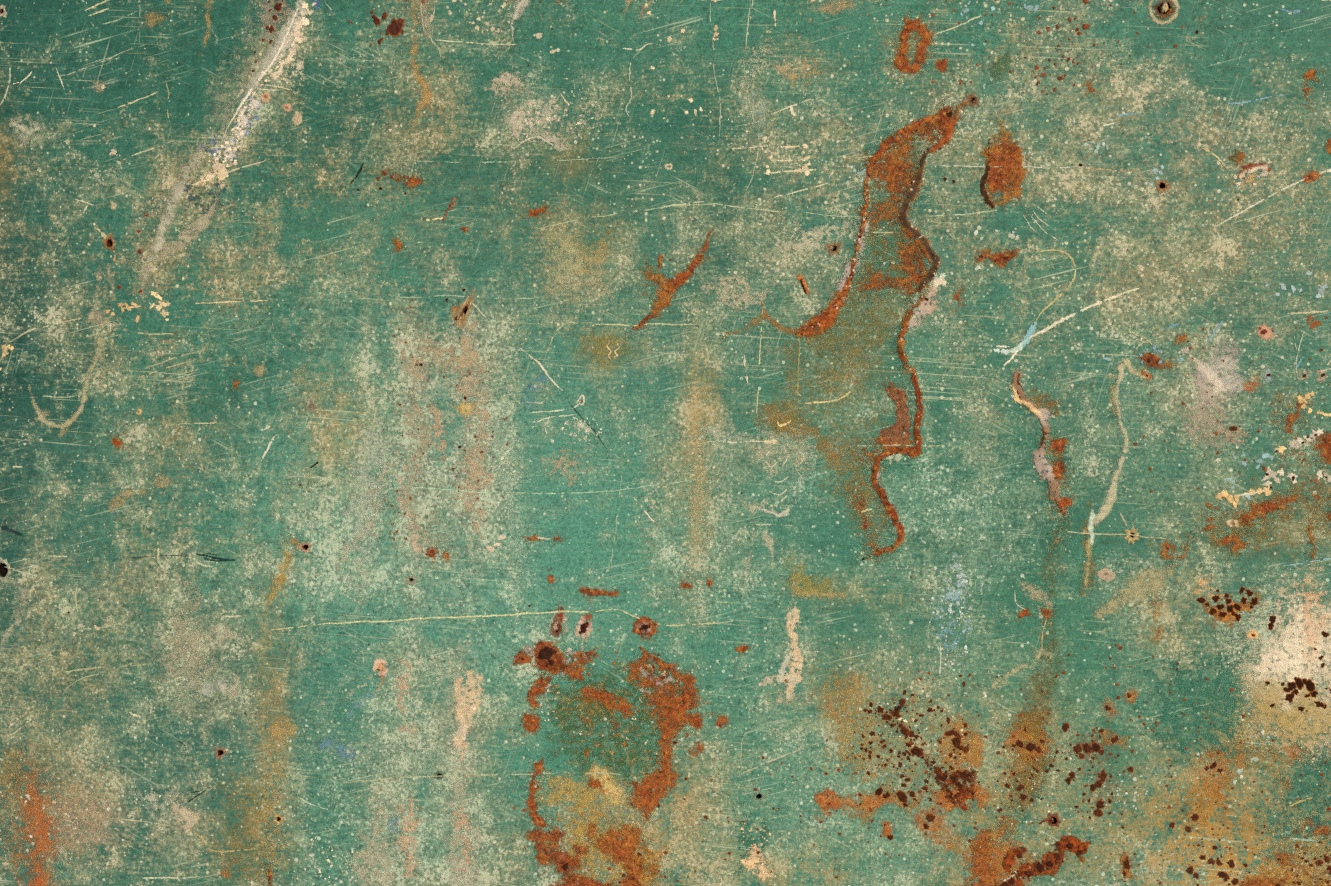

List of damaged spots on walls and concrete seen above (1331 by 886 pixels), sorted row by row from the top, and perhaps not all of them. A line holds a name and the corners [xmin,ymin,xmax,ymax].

rust [886,13,958,85]
rust [1009,0,1120,94]
rust [980,121,1028,208]
rust [633,230,713,330]
rust [757,106,963,560]
rust [1271,348,1330,433]
rust [1197,432,1331,563]
rust [1195,575,1260,627]
rust [510,646,793,886]
rust [810,629,1331,886]